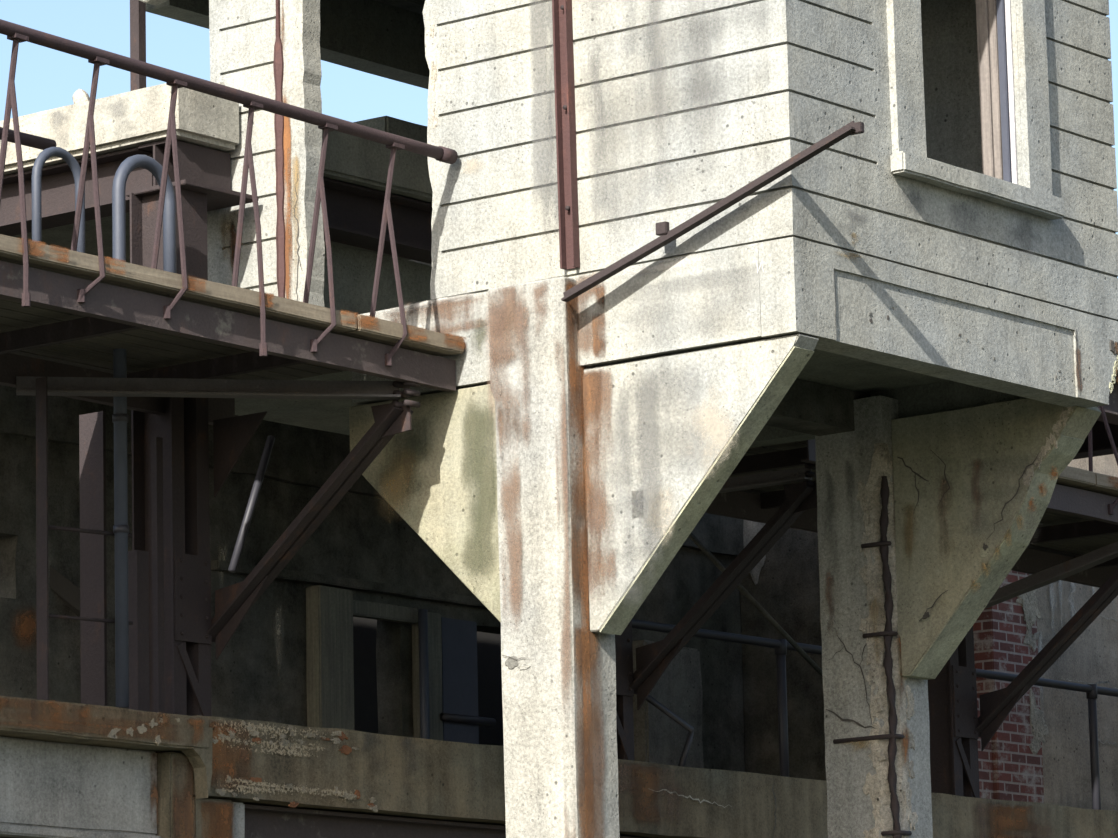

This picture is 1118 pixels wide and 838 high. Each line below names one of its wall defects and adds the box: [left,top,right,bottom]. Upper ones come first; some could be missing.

corrosion [393,285,546,442]
crack [897,450,950,510]
crack [987,453,1039,539]
corrosion [502,471,522,613]
spalling [833,443,918,838]
corrosion [0,697,251,788]
peeling [212,719,359,758]
corrosion [173,761,233,838]
peeling [215,774,378,812]